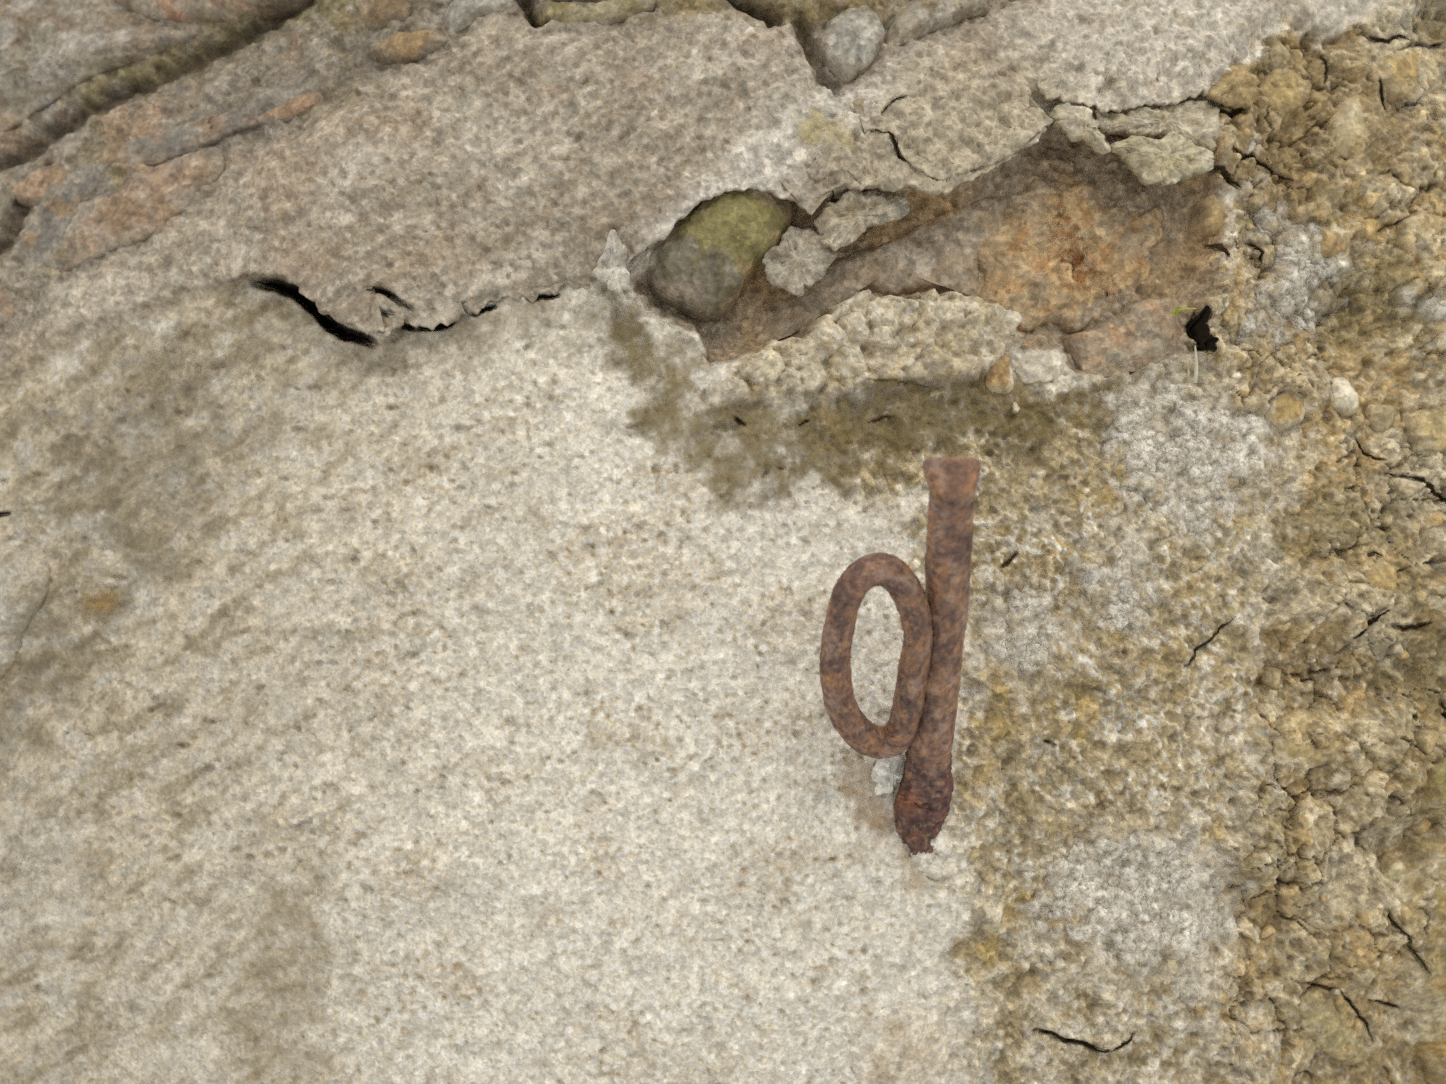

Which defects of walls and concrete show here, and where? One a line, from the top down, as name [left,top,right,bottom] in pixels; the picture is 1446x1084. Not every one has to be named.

crack [876,95,908,161]
crack [1212,108,1293,188]
spalling [591,65,1260,386]
crack [1203,240,1264,263]
crack [257,281,496,343]
crack [536,293,558,301]
crack [1186,305,1219,352]
crack [1355,438,1446,502]
crack [1354,609,1434,639]
crack [1033,1029,1135,1053]